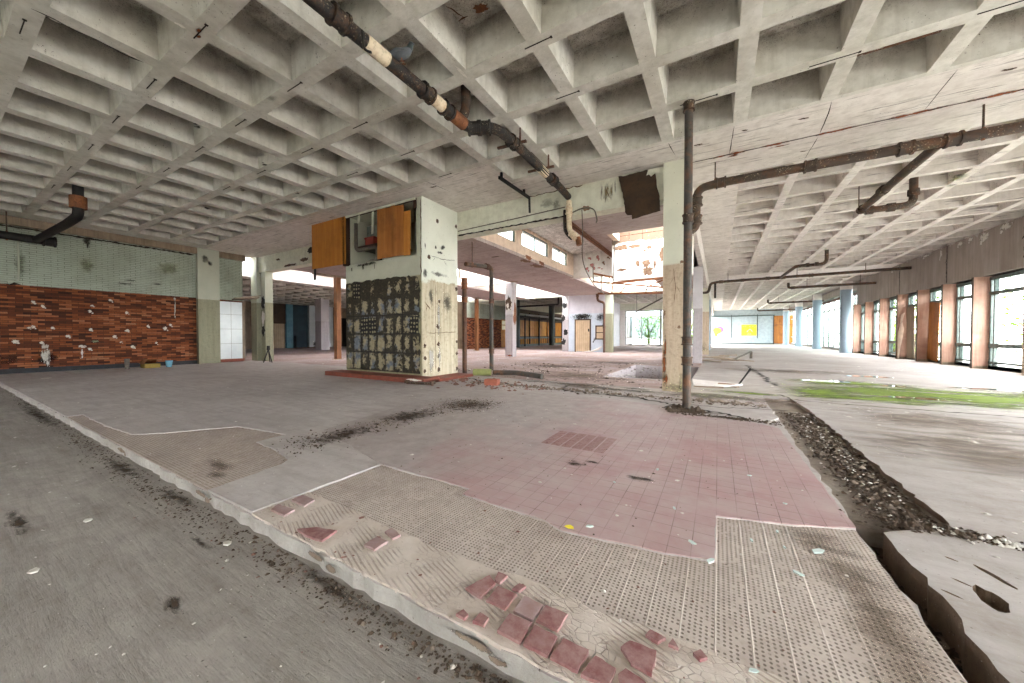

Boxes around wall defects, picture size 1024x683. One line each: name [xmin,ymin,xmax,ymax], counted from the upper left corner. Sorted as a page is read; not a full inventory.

peeling [612,244,663,276]
spalling [452,630,507,667]